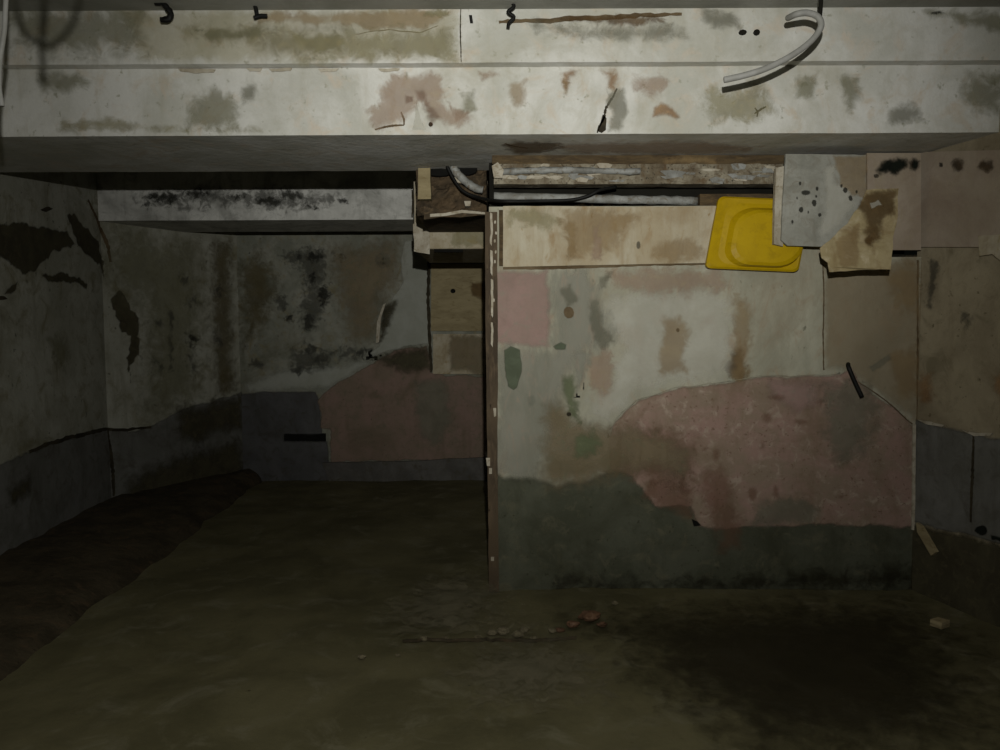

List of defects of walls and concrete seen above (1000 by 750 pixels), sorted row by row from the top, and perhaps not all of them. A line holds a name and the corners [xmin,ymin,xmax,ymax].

mould [144,190,208,206]
mould [258,191,317,210]
peeling [0,214,104,300]
peeling [111,291,140,372]
peeling [248,162,945,529]
crack [29,426,151,496]
leakage [498,471,1000,627]